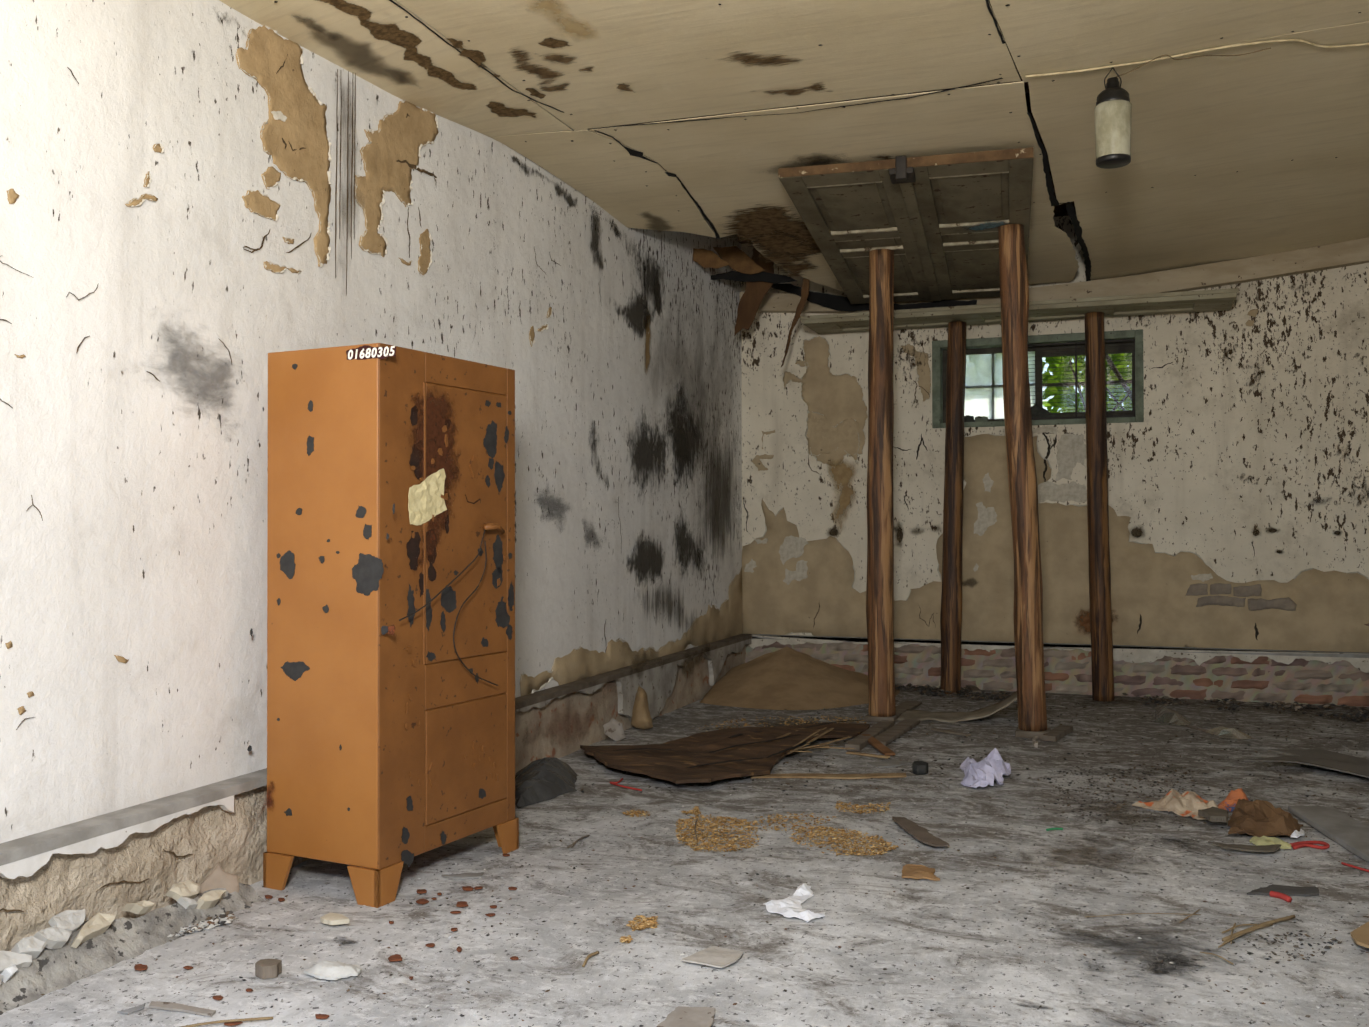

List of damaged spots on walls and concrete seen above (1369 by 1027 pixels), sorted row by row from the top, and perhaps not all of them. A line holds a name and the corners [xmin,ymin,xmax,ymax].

flaking render [236,25,331,267]
water stain [298,0,477,296]
flaking render [355,100,439,275]
water stain [447,38,500,77]
water stain [486,0,593,118]
water stain [627,367,731,626]
flaking render [515,499,868,775]
flaking render [893,534,943,688]
flaking render [961,434,1017,691]
flaking render [1032,425,1092,695]
flaking render [1108,505,1369,707]
flaking render [0,785,267,952]